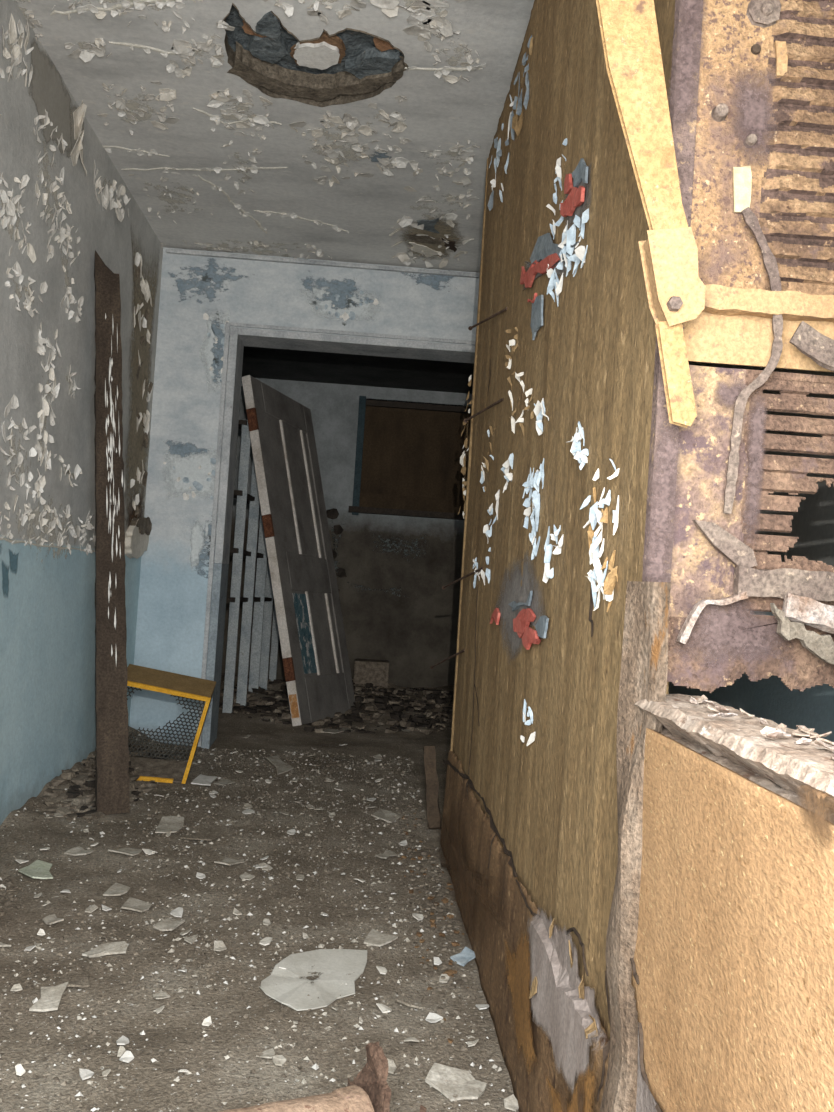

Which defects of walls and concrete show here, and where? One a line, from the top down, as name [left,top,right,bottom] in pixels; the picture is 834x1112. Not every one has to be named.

rust [671,0,703,115]
spalling [0,0,533,561]
rust [717,381,743,406]
peeling [458,375,564,588]
peeling [569,421,620,612]
rust [646,432,681,582]
crack [587,588,595,637]
rust [690,593,834,659]
crack [442,585,537,916]
peeling [520,699,536,746]
rust [800,785,833,835]
peeling [528,910,603,1091]